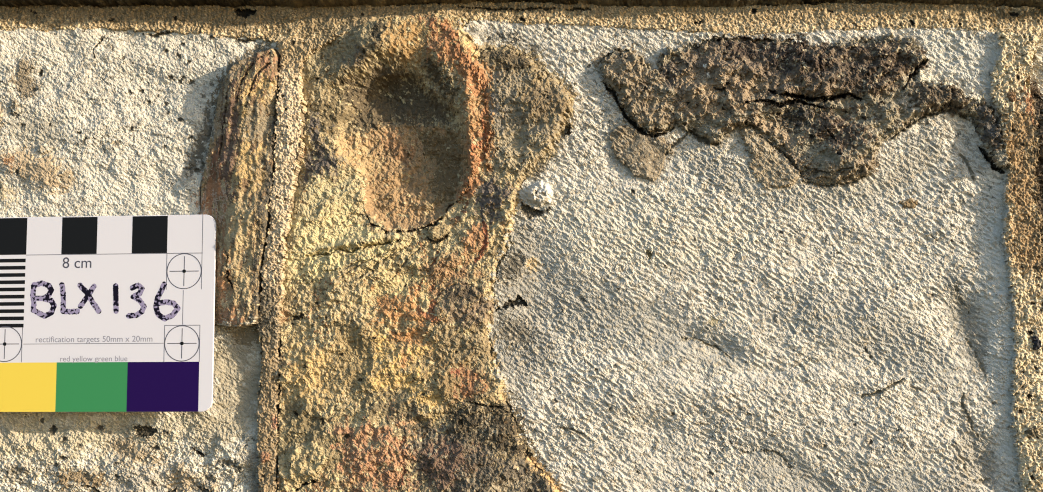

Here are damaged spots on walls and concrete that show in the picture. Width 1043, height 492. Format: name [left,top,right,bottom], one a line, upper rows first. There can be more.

peeling [428,222,450,240]
spalling [463,7,1043,492]
crack [860,348,923,398]
peeling [287,441,327,488]